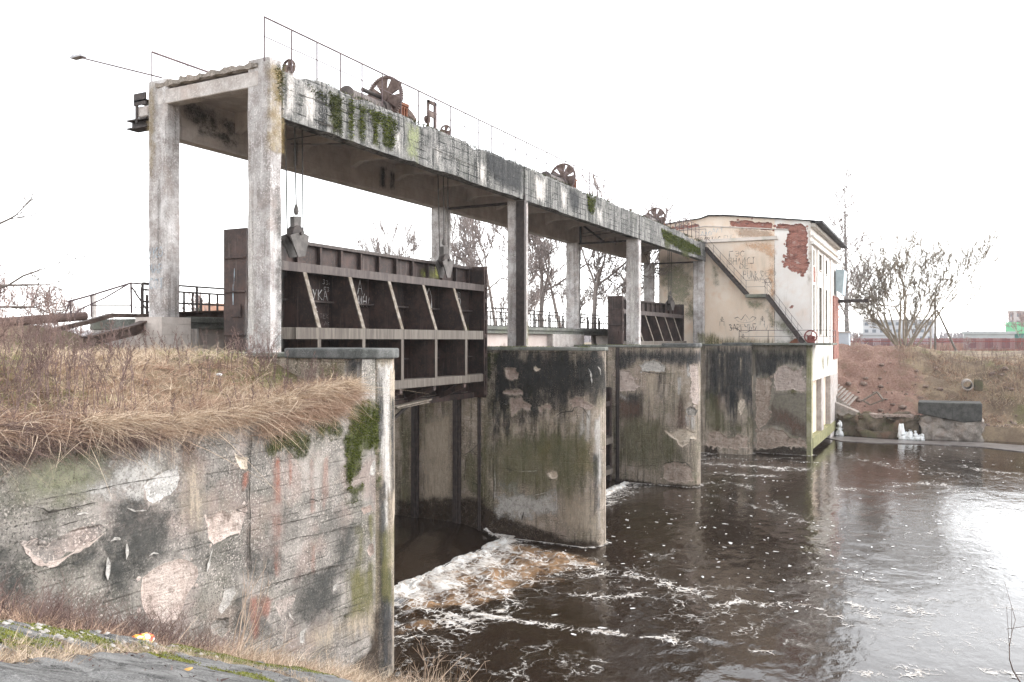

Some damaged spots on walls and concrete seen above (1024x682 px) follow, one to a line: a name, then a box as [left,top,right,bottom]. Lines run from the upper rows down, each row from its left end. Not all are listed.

flaking render [730,218,810,277]
peeling [503,367,552,418]
damp [619,334,807,432]
peeling [665,364,807,451]
damp [754,391,807,455]
peeling [20,521,104,568]
damp [73,442,202,594]
peeling [144,466,179,504]
spalling [204,501,247,547]
crack [226,431,378,659]
damp [299,350,701,682]